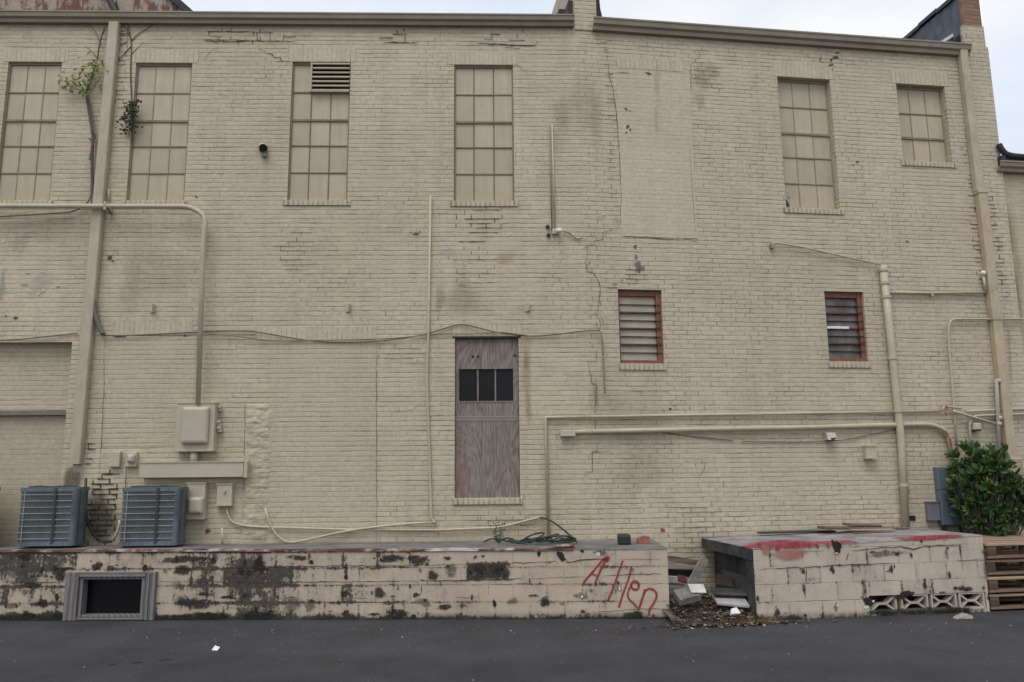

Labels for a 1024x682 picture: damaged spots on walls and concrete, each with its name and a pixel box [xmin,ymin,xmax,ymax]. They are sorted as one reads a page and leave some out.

crack [578,49,696,478]
spalling [87,469,118,545]
leakage [0,610,63,621]
leakage [156,612,228,620]
leakage [243,611,275,620]
leakage [624,611,643,619]